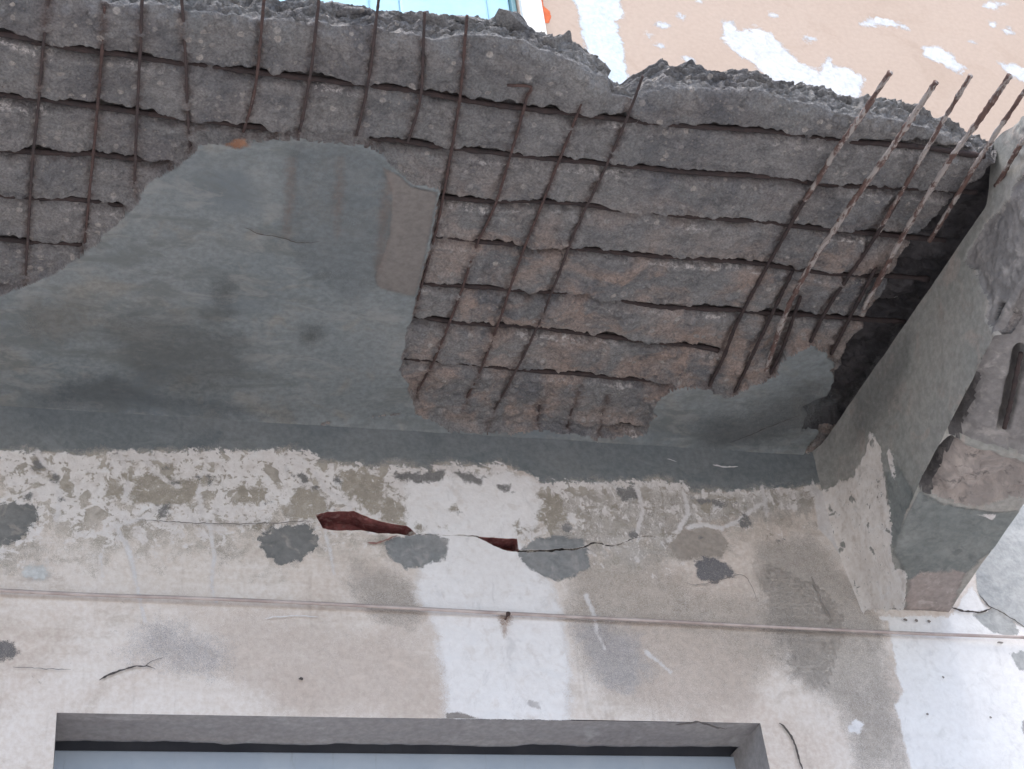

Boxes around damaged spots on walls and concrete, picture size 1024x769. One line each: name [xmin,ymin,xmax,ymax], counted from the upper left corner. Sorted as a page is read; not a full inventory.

spalling [0,0,1024,520]
crack [139,511,633,553]
peeling [0,432,967,623]
crack [100,658,162,680]